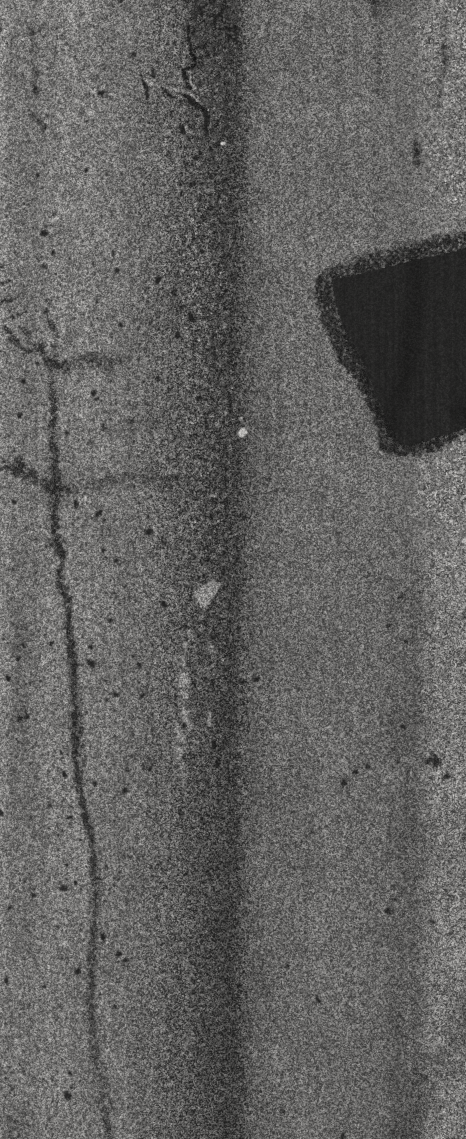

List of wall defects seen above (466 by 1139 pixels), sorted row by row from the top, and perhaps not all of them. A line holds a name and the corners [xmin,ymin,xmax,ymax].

crack [140,24,210,136]
crack [0,265,154,1048]